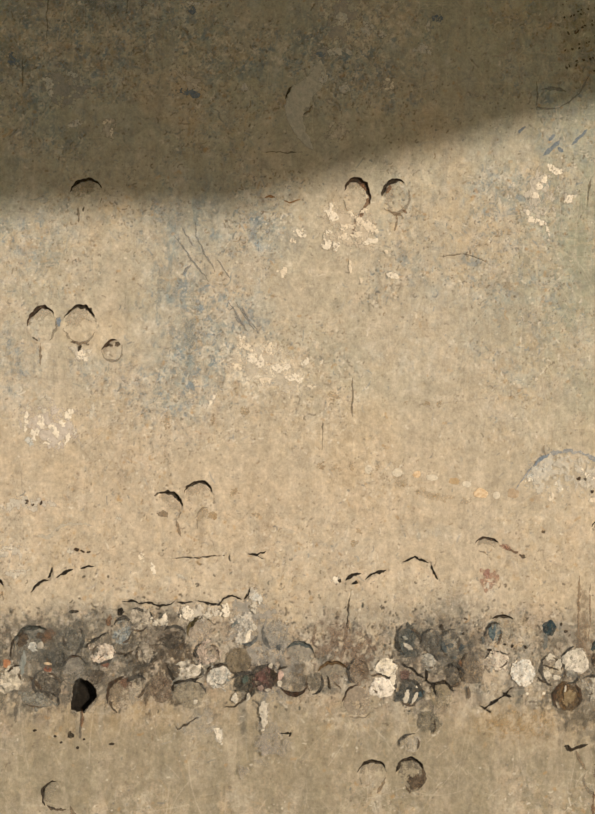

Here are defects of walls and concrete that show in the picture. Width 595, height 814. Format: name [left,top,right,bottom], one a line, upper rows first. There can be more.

peeling [284,0,387,149]
crack [31,565,94,592]
crack [123,587,255,608]
crack [176,551,266,561]
crack [346,556,438,627]
water stain [577,576,595,666]
water stain [0,613,195,712]
water stain [226,600,305,701]
water stain [312,624,375,678]
spalling [70,678,99,728]
water stain [563,689,576,706]